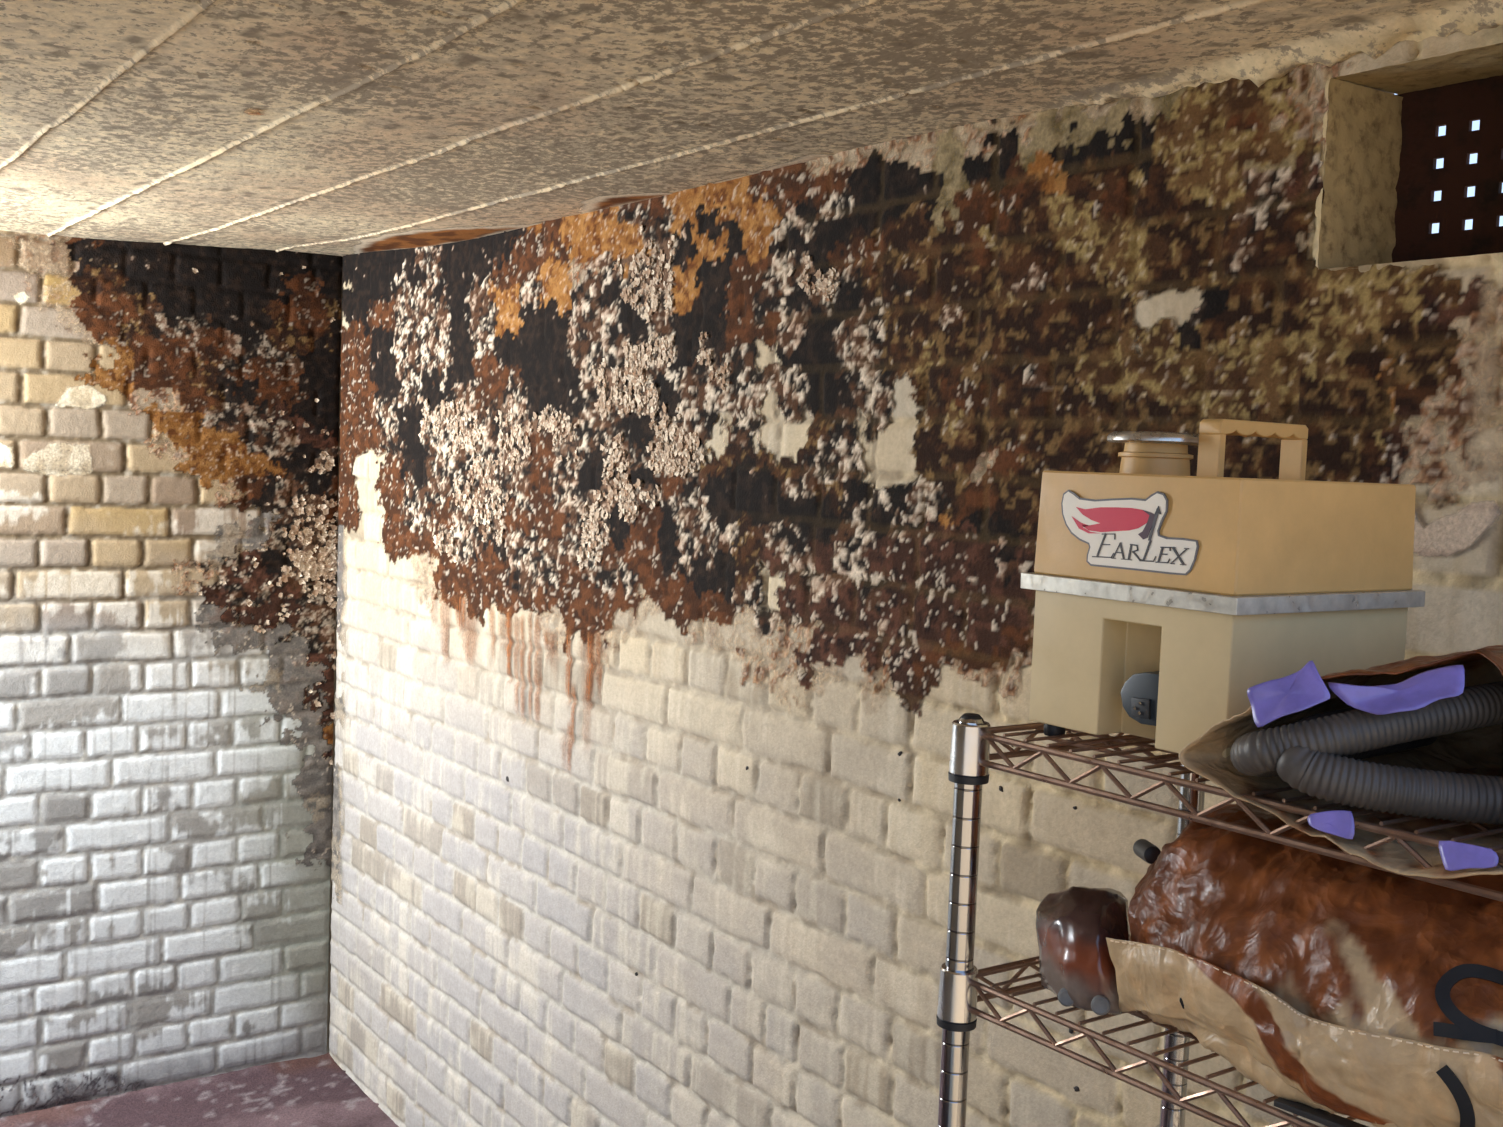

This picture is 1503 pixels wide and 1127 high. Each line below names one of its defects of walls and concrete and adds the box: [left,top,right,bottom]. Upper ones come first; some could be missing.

peeling [14,292,28,304]
peeling [56,385,106,409]
peeling [0,443,91,476]
water stain [9,62,1491,903]